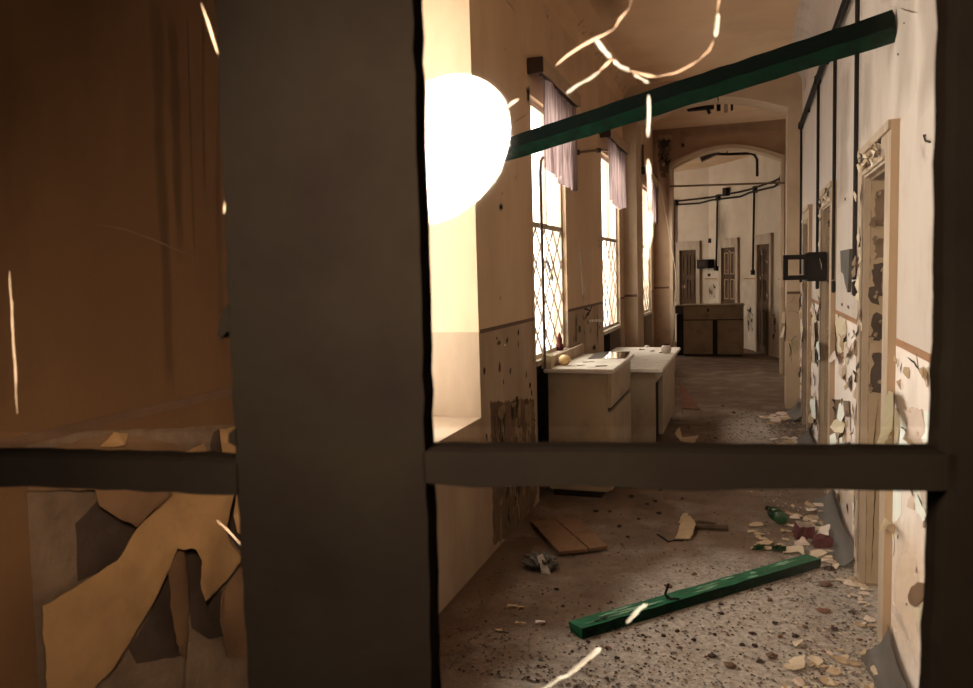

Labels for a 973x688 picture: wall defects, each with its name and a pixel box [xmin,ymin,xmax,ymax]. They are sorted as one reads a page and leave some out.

peeling [798,138,929,444]
peeling [24,425,236,453]
peeling [835,490,926,584]
peeling [27,486,248,688]
peeling [907,582,924,629]